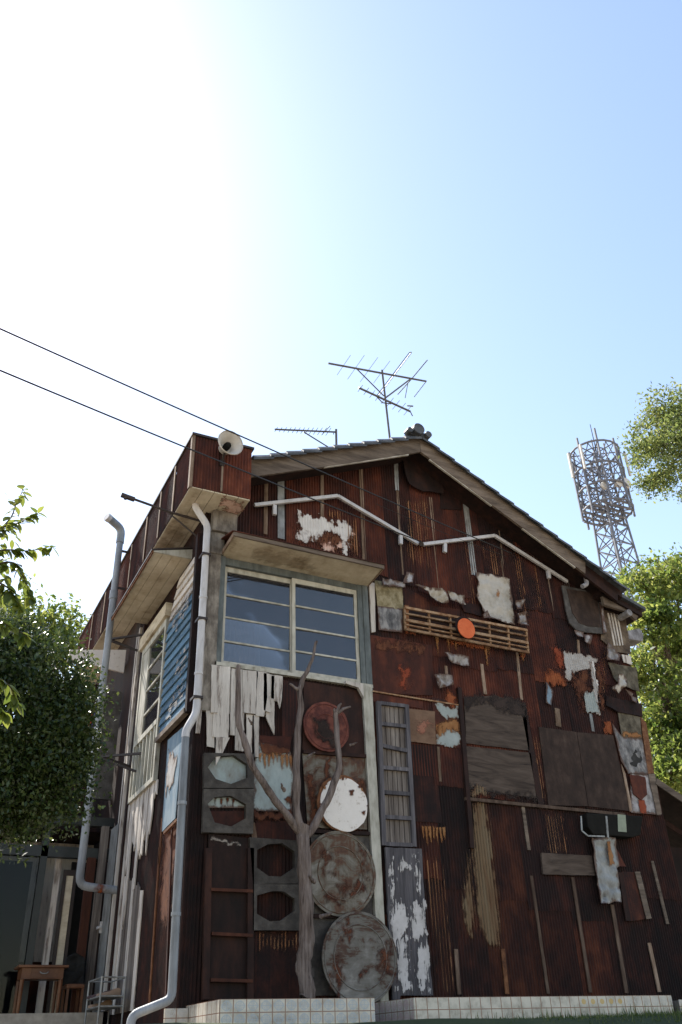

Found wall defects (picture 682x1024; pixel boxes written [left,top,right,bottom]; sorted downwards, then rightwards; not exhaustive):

peeling [295,509,356,556]
rust [375,631,490,691]
peeling [563,651,601,716]
rust [544,647,641,738]
rust [306,758,367,826]
rust [322,844,369,906]
peeling [388,854,431,993]
rust [359,940,396,979]